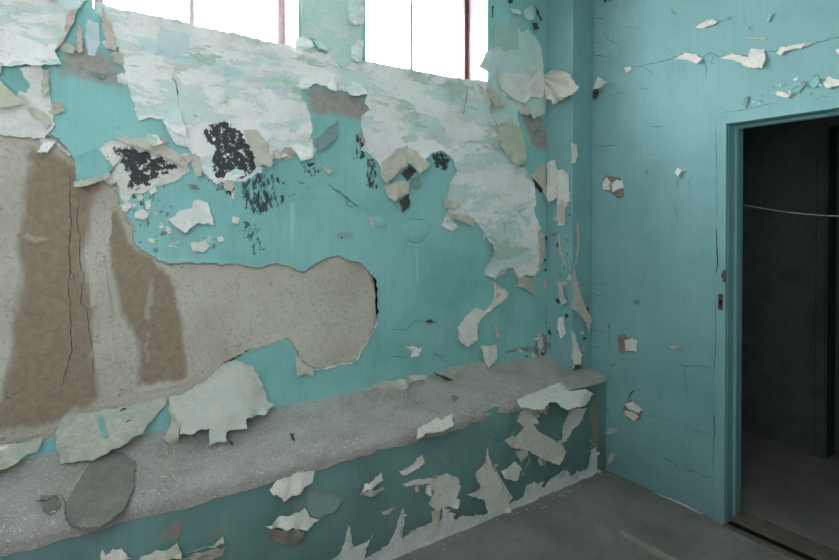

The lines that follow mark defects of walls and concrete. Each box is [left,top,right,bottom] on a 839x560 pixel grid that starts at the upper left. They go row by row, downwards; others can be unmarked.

peeling [593,77,607,100]
crack [593,18,839,97]
peeling [727,74,839,112]
water stain [197,83,379,263]
spalling [601,175,625,198]
peeling [0,0,592,470]
crack [60,167,96,402]
water stain [0,138,194,444]
spalling [618,334,638,353]
spalling [623,390,643,422]
peeling [399,383,593,527]
peeling [265,466,385,547]